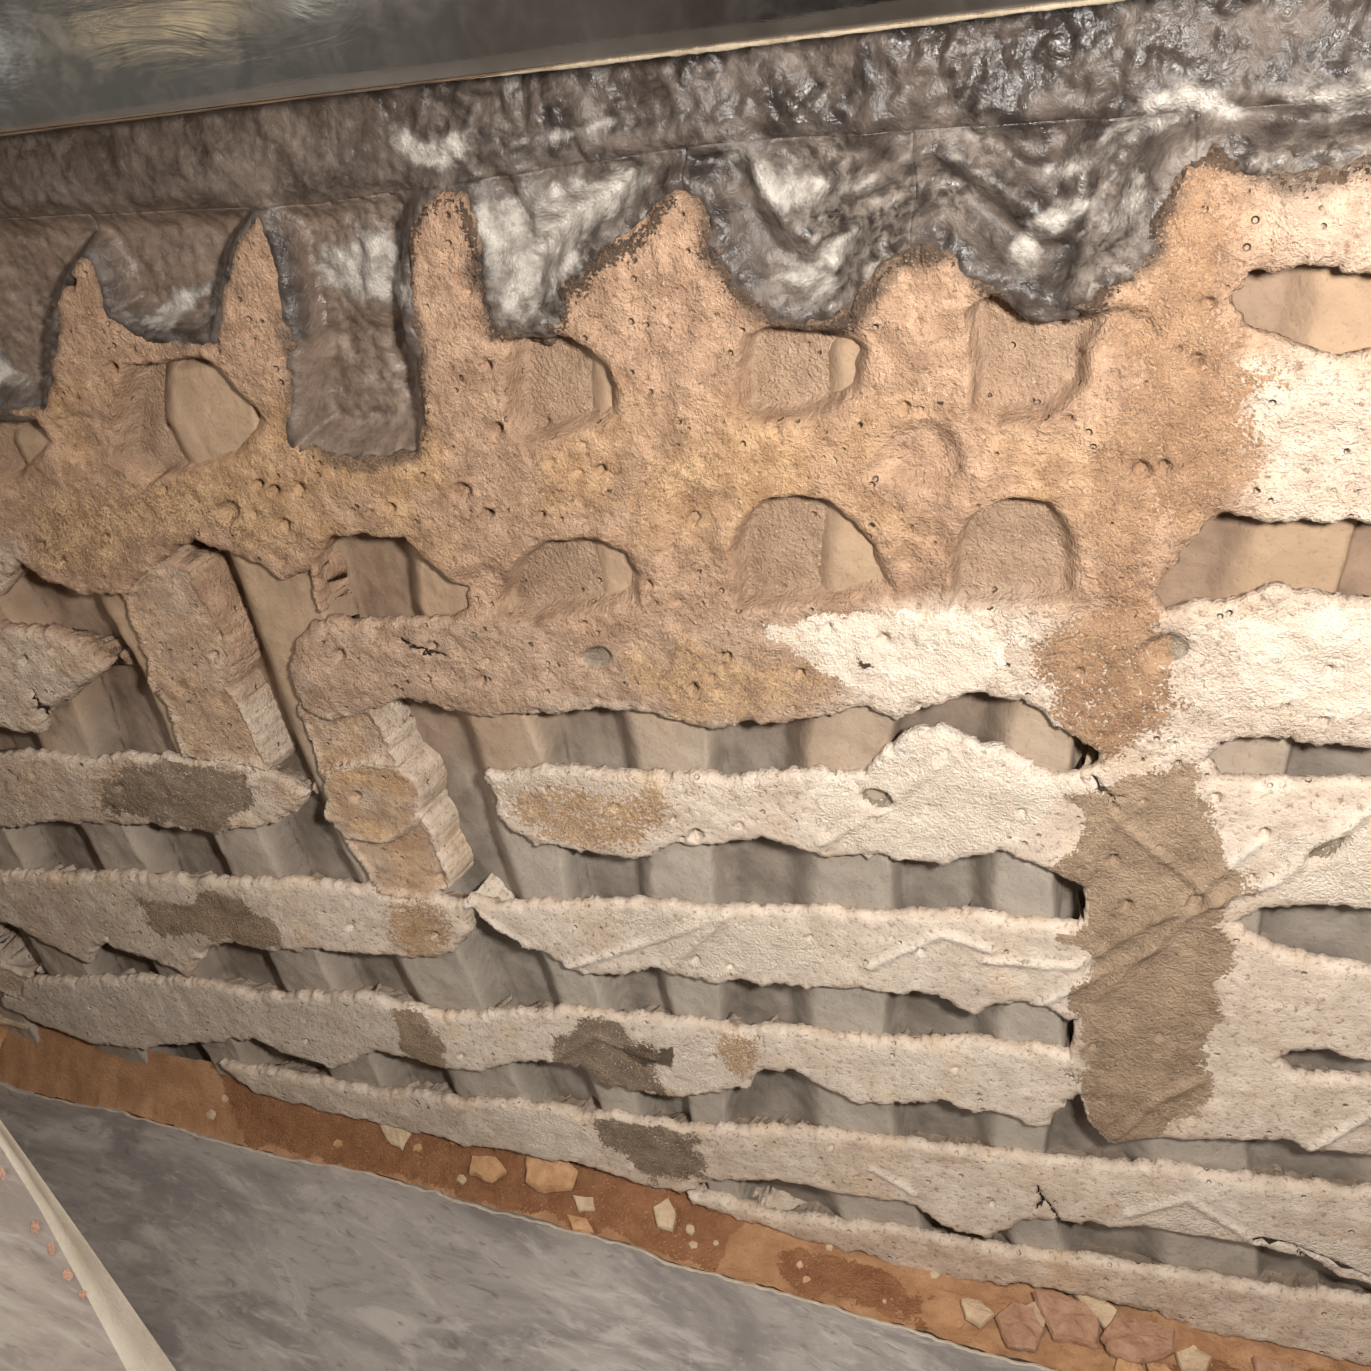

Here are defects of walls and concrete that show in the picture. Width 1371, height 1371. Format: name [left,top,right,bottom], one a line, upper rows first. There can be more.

water stain [0,0,1371,762]
spalling [762,598,1045,713]
spalling [1223,606,1371,721]
water stain [98,751,256,834]
spalling [806,732,1074,861]
spalling [1271,822,1371,908]
water stain [136,889,285,950]
water stain [1043,754,1265,1143]
water stain [543,1014,667,1096]
water stain [593,1118,708,1187]
spalling [1111,1186,1371,1283]
peeling [1027,1291,1212,1371]